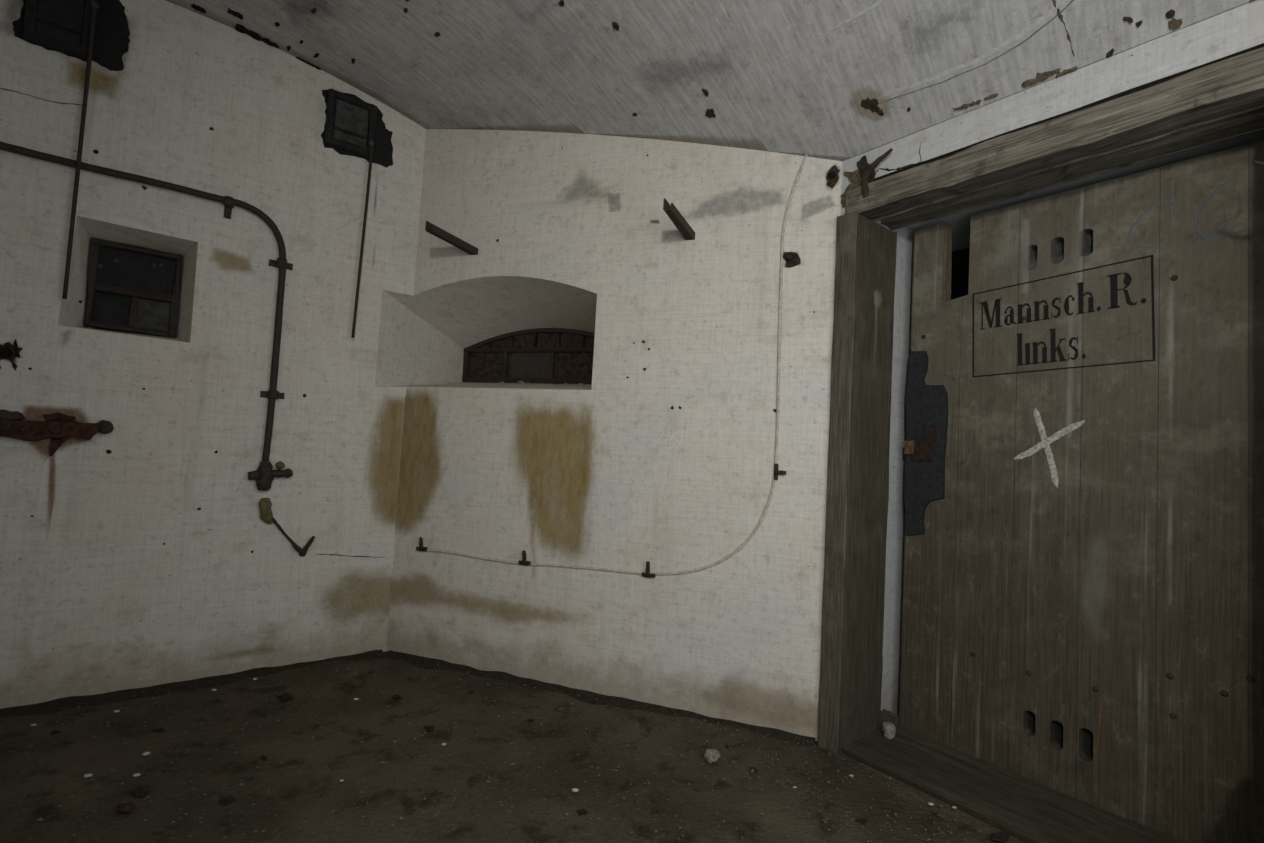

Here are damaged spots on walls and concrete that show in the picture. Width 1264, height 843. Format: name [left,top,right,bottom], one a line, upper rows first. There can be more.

crack [1052,0,1075,57]
corrosion [24,407,86,423]
corrosion [30,437,91,514]
damp [373,395,438,528]
damp [518,410,589,551]
damp [329,578,548,619]